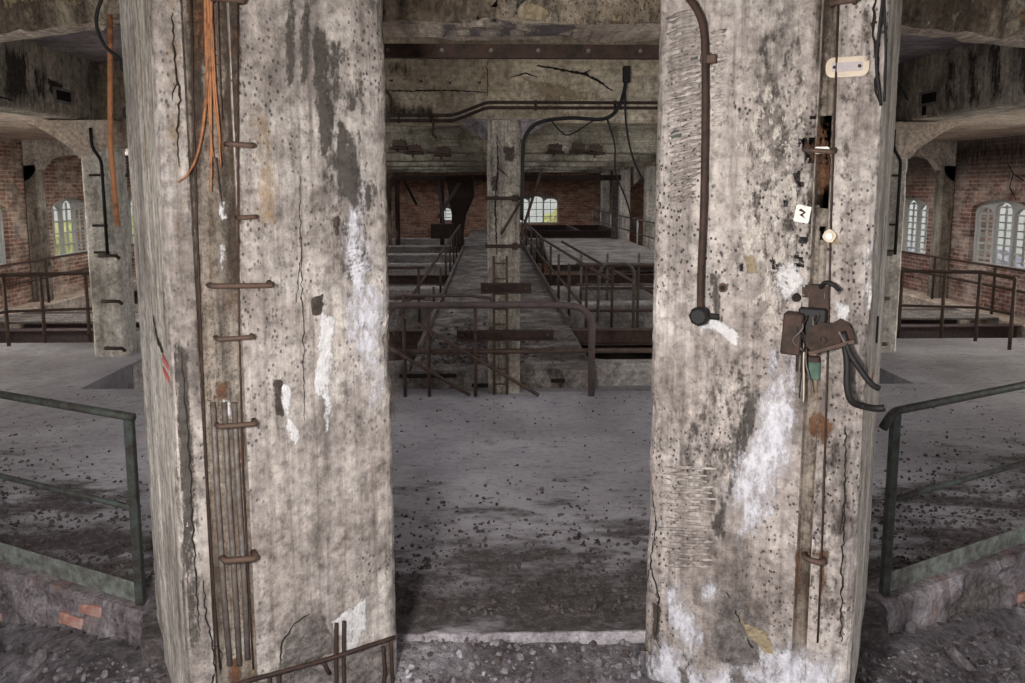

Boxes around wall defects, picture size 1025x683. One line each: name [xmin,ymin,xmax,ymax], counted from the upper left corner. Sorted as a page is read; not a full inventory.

rust [807,128,830,194]
damp [283,0,398,415]
peeling [734,249,809,300]
peeling [835,301,849,321]
rust [214,382,227,399]
peeling [273,380,300,445]
peeling [311,294,335,432]
rust [809,412,833,443]
spalling [235,617,396,683]
spalling [652,603,661,642]
spalling [712,588,779,683]